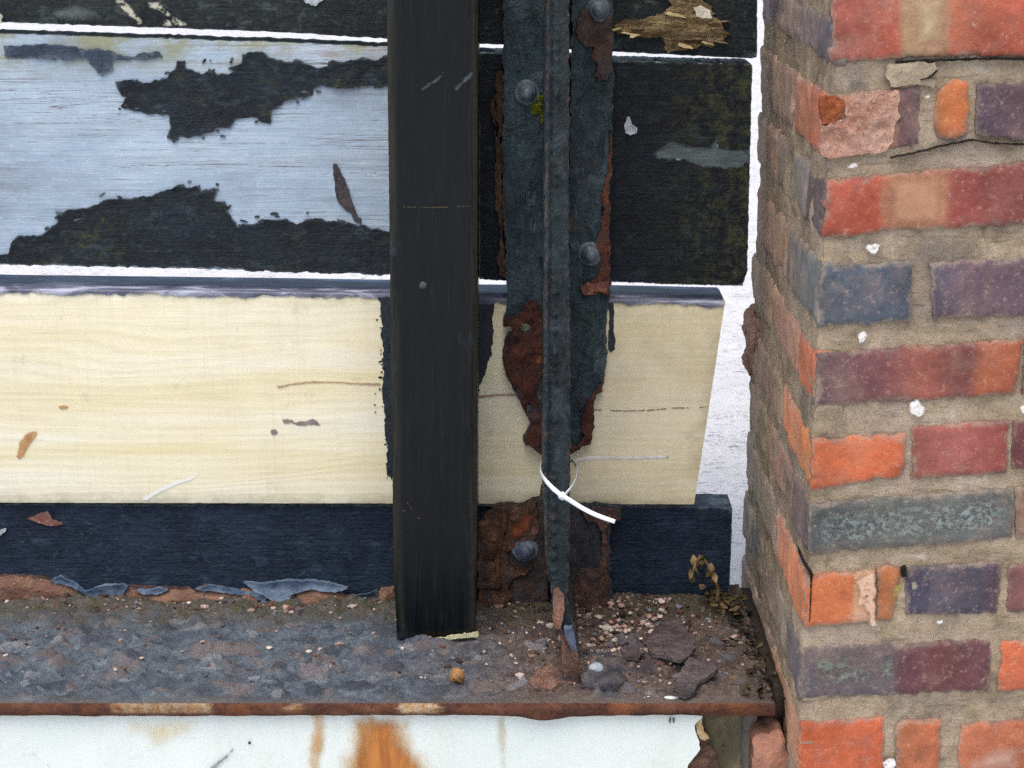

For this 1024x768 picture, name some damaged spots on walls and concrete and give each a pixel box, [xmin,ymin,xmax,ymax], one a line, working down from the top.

peeling [4,43,388,143]
spalling [817,89,900,158]
crack [890,139,1024,159]
peeling [0,164,390,276]
corrosion [581,129,613,296]
corrosion [502,299,542,455]
peeling [0,574,395,605]
corrosion [477,500,540,608]
corrosion [552,506,621,629]
crack [797,544,813,622]
peeling [855,573,876,626]
corrosion [350,722,420,768]